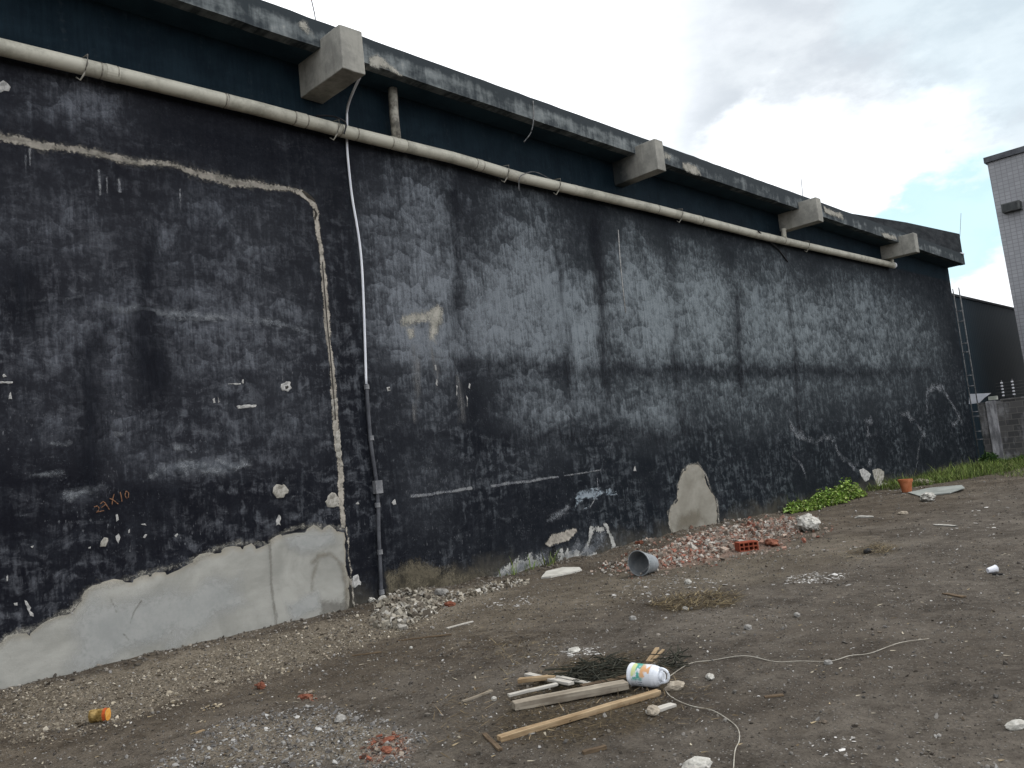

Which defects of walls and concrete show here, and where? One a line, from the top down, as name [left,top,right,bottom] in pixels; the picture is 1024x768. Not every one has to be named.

flaking render [0,134,359,528]
peeling [88,514,147,549]
peeling [496,523,616,577]